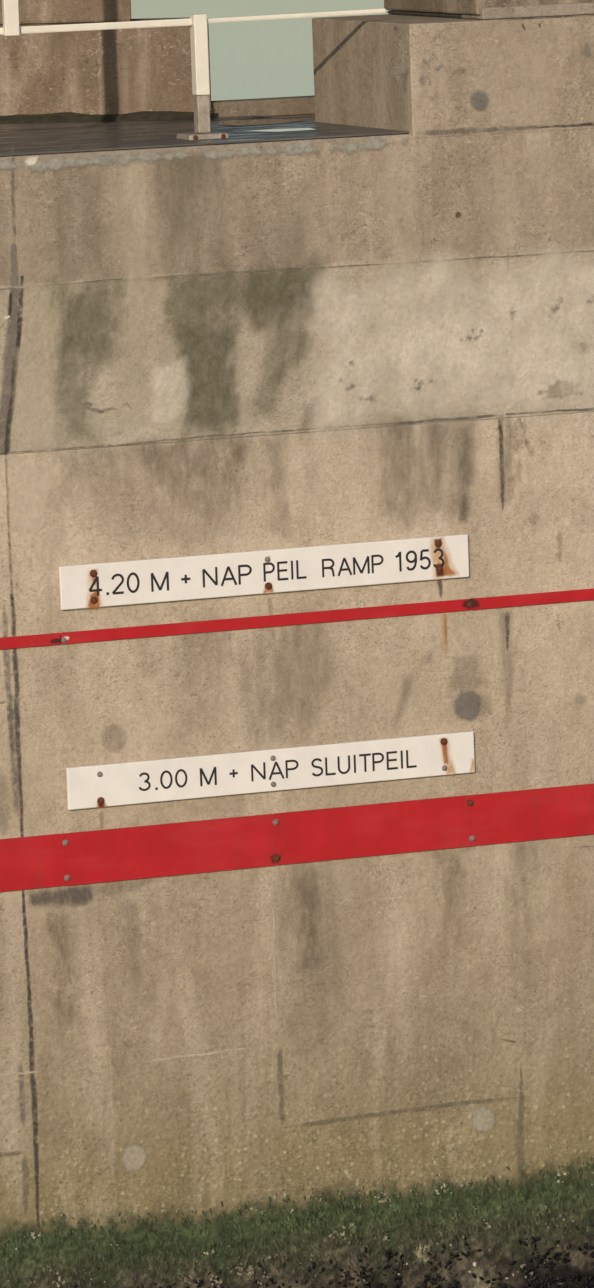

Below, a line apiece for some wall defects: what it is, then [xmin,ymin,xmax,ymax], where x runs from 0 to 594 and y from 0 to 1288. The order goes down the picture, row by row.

leakage [168,266,318,431]
crack [0,160,163,837]
rust [434,539,454,596]
crack [391,408,594,506]
crack [0,890,40,1227]